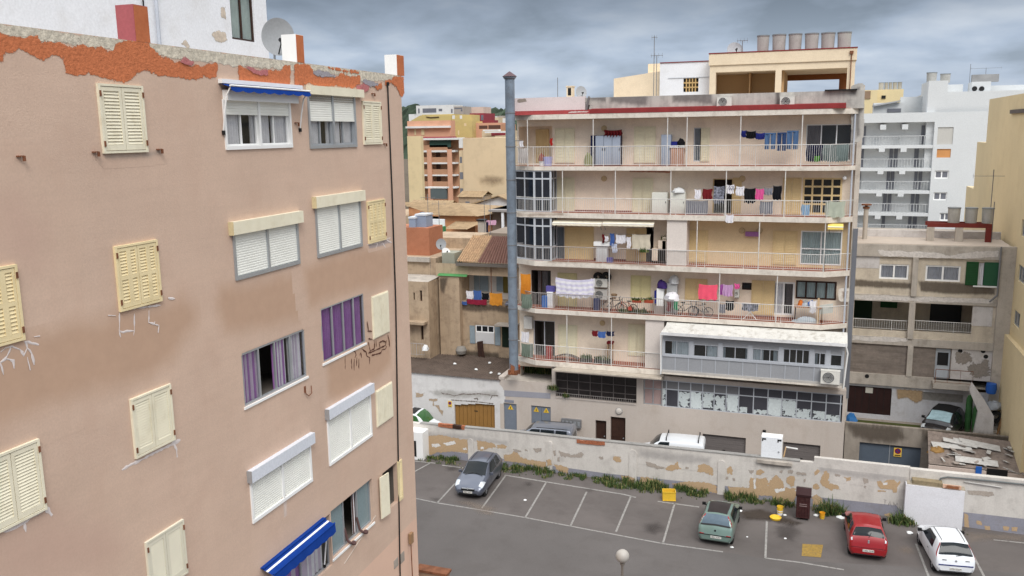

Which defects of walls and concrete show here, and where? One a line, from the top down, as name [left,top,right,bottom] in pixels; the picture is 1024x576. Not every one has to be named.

peeling [0,7,404,97]
crack [108,297,175,338]
crack [0,335,40,375]
crack [345,322,390,368]
peeling [955,349,991,378]
flaking render [416,393,621,474]
flaking render [621,462,901,505]